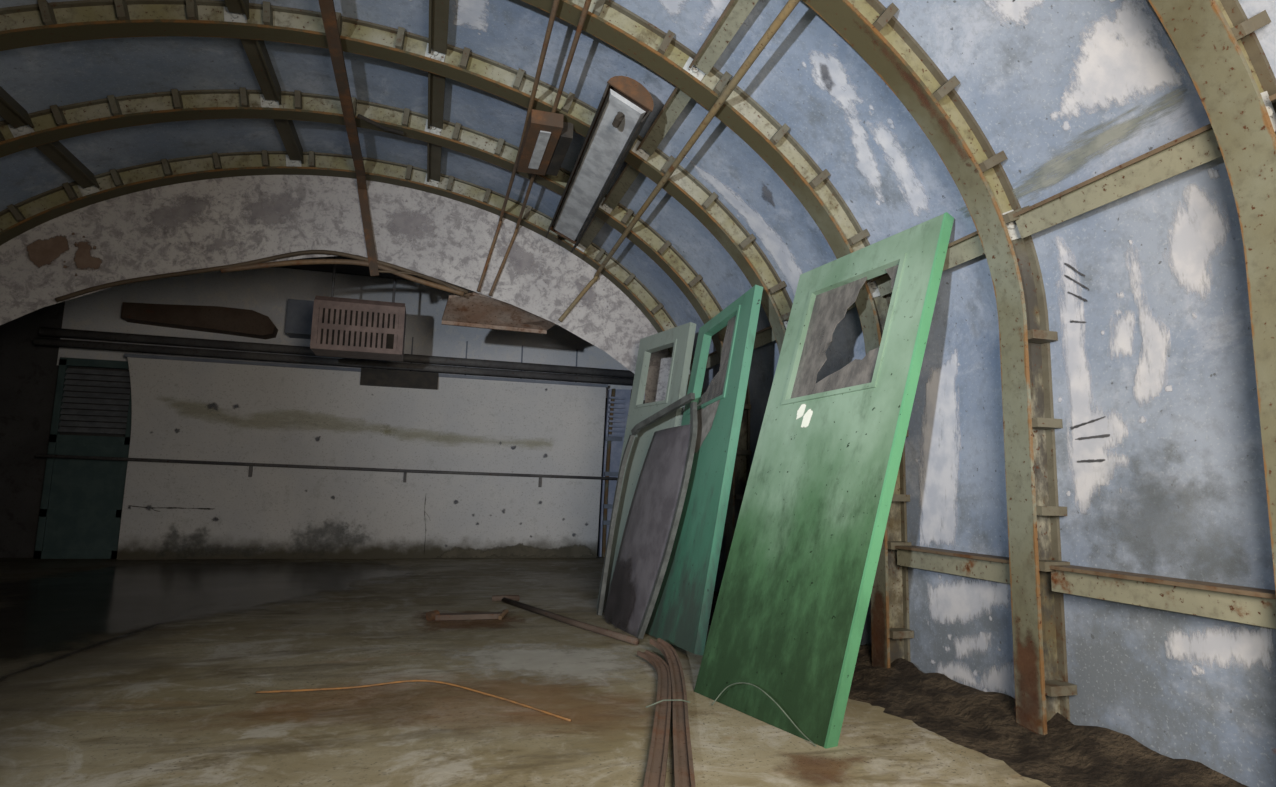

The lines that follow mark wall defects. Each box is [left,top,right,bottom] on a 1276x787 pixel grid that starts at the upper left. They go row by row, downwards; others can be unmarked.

peeling [1051,0,1182,130]
peeling [1169,168,1229,298]
corrosion [1015,637,1040,734]
peeling [1165,626,1273,675]